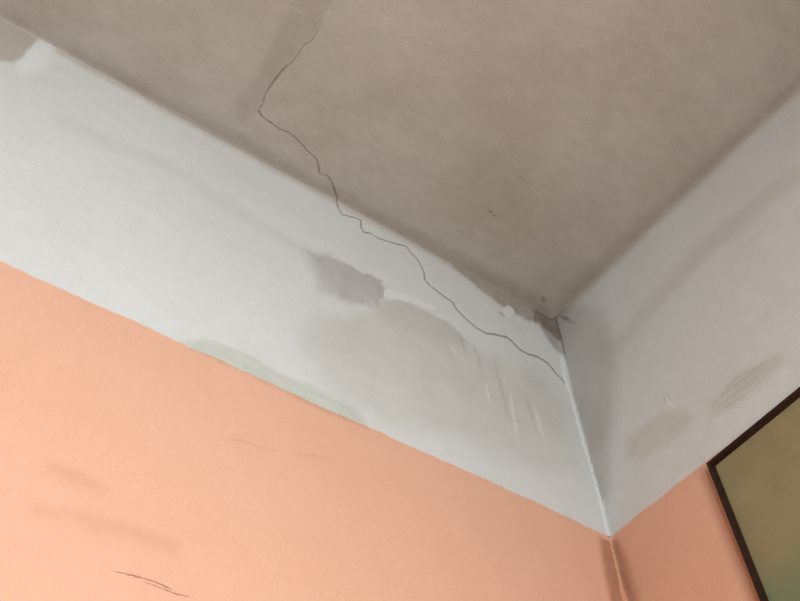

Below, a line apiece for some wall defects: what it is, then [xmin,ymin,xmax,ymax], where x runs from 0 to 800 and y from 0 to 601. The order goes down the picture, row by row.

leakage [381,286,439,312]
crack [258,26,564,381]